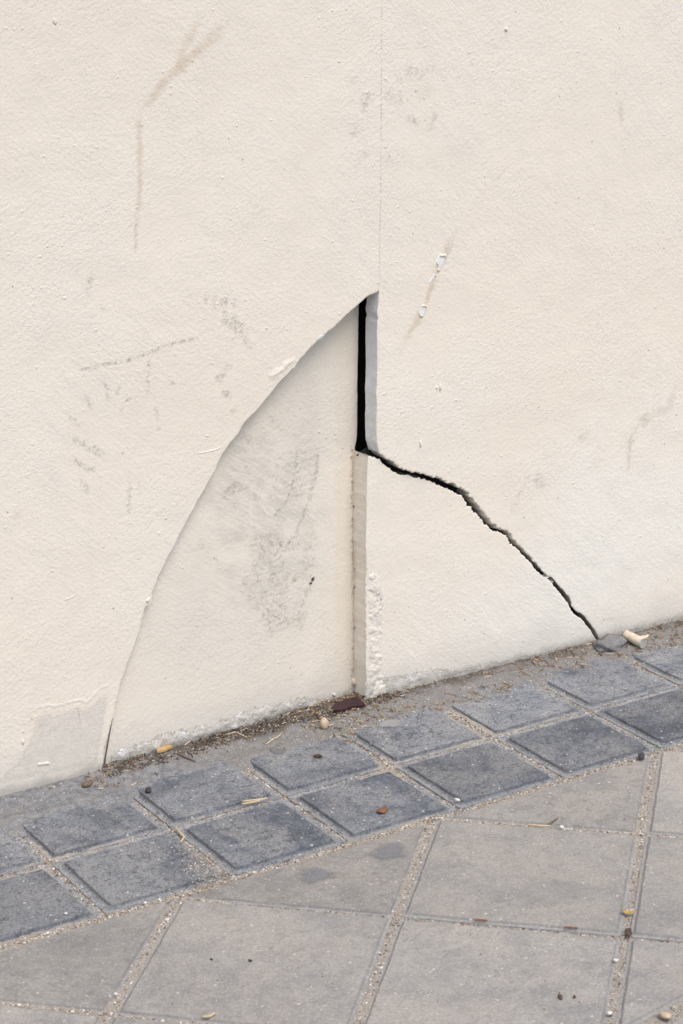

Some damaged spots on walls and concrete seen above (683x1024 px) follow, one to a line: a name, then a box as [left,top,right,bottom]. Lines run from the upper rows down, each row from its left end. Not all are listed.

crack [355,297,599,639]